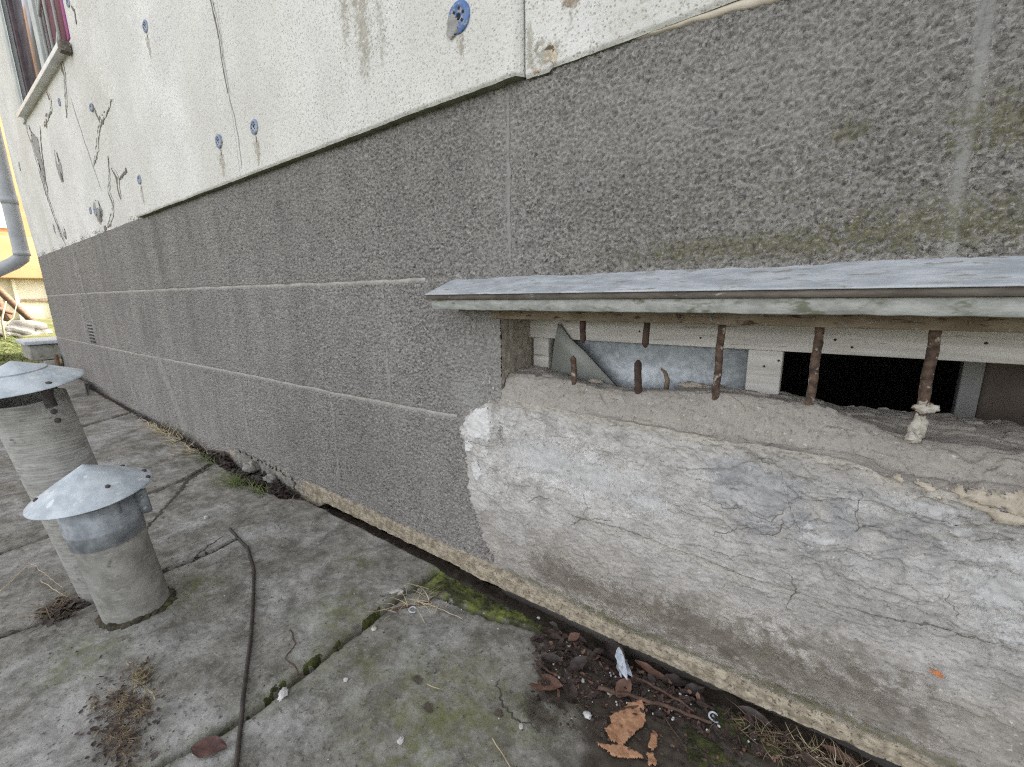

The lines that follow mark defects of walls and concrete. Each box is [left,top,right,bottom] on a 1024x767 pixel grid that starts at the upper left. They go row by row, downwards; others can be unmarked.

crack [210,0,242,168]
crack [26,61,127,246]
crack [570,495,659,543]
crack [699,501,800,536]
flaking render [901,512,976,538]
crack [719,565,797,610]
crack [853,594,1016,654]